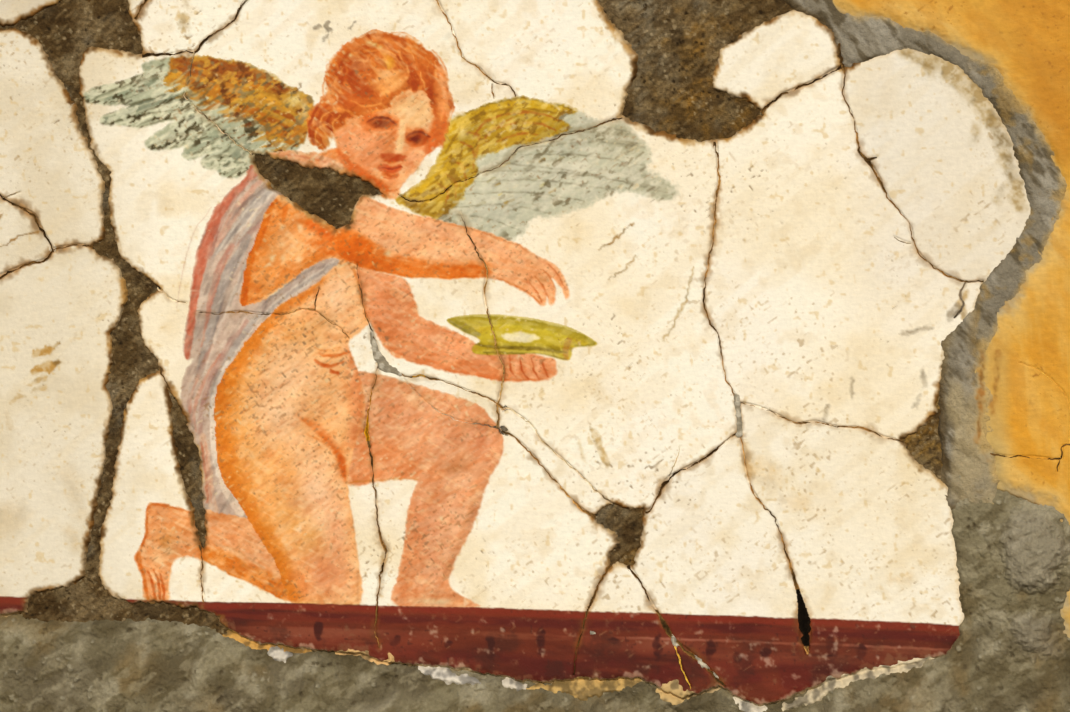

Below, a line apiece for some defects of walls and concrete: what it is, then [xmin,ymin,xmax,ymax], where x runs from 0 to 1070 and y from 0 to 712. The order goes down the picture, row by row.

crack [130,0,252,155]
flaking render [595,0,861,148]
crack [0,190,96,287]
flaking render [247,149,391,237]
crack [758,40,988,318]
flaking render [0,0,312,663]
crack [156,112,628,652]
crack [644,139,905,662]
flaking render [586,496,651,571]
flaking render [502,677,642,701]
crack [569,558,727,689]
flaking render [781,657,934,711]